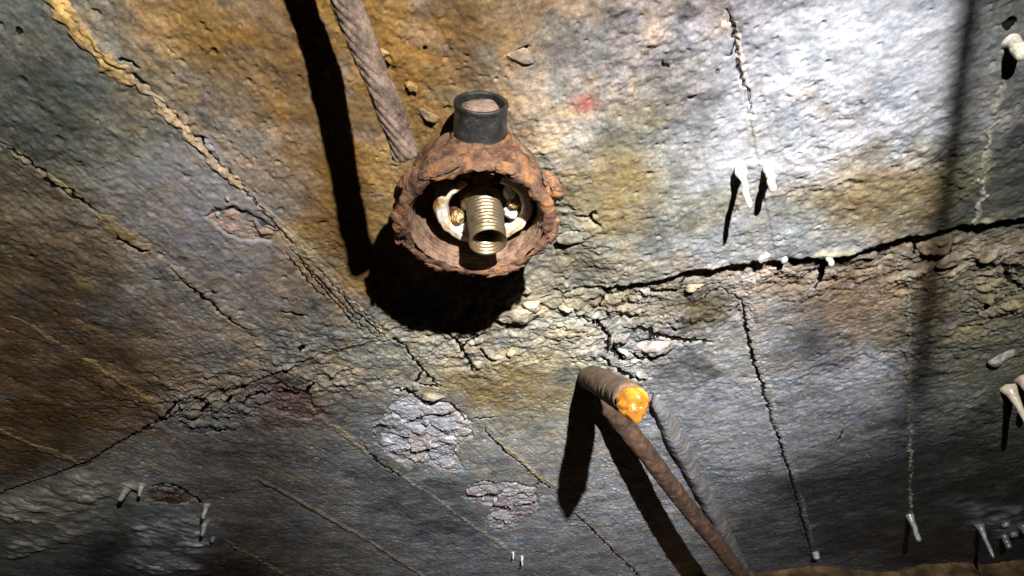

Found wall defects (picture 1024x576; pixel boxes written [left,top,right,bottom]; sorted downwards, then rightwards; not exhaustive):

crack [118,58,146,84]
crack [0,141,96,211]
spalling [204,205,281,243]
crack [166,105,557,503]
crack [563,282,711,381]
crack [800,254,842,289]
crack [870,220,1004,255]
crack [975,261,1024,288]
crack [0,381,316,493]
spalling [371,382,474,472]
crack [679,259,811,549]
spalling [460,481,541,531]